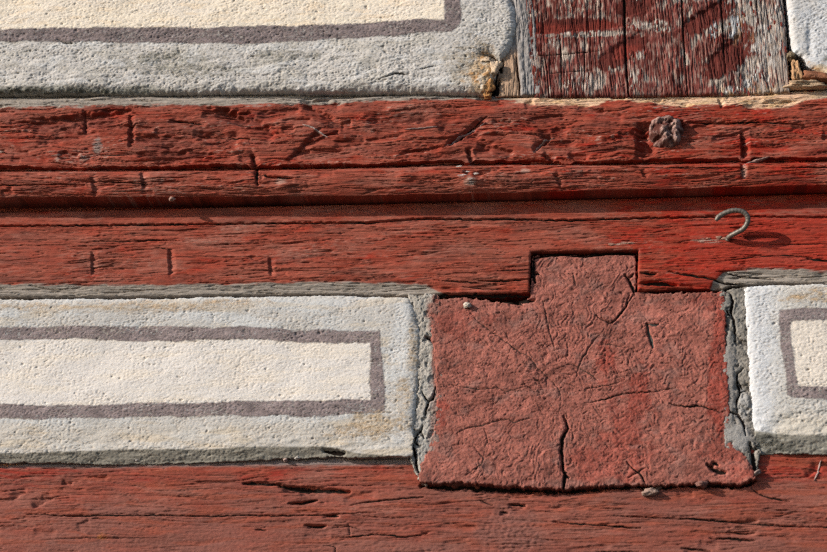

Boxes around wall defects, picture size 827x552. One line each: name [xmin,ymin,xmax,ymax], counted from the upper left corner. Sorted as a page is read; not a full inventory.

flaking render [467,50,503,100]
peeling [563,0,601,16]
peeling [545,30,620,49]
peeling [530,50,646,104]
peeling [627,18,670,34]
peeling [650,0,795,107]
crack [534,252,634,286]
crack [598,296,633,324]
crack [726,292,736,343]
crack [459,312,759,474]
crack [413,391,435,473]
crack [560,423,570,491]